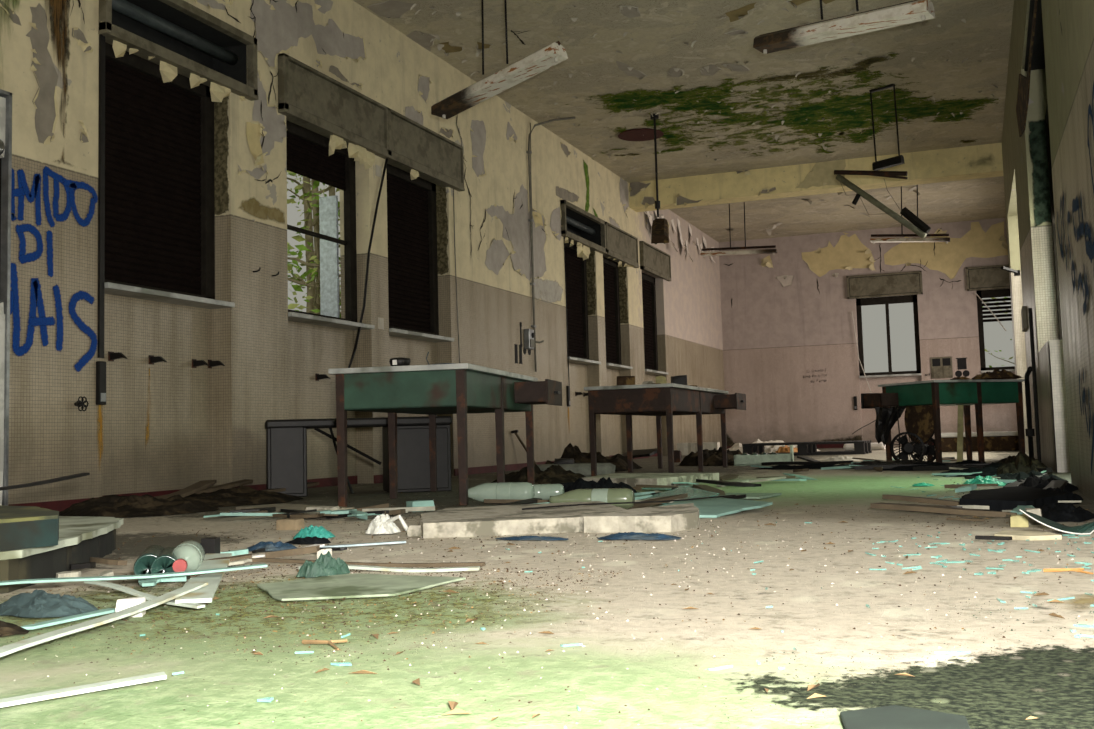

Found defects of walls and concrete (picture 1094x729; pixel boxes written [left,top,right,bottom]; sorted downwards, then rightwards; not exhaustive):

peeling [0,0,59,145]
corrosion [48,0,70,132]
peeling [72,27,93,53]
peeling [112,0,367,179]
peeling [329,135,375,170]
peeling [485,142,715,281]
peeling [718,2,764,50]
peeling [802,222,1008,279]